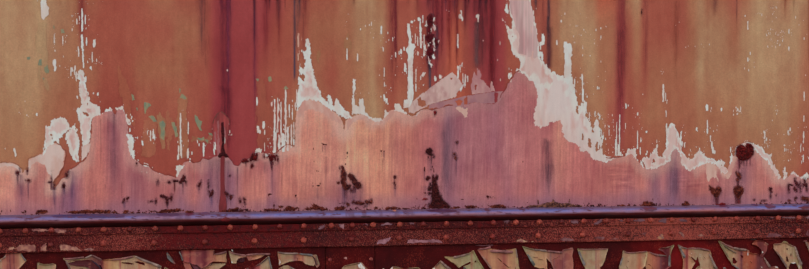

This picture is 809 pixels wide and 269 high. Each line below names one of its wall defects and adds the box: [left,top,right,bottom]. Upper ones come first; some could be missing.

corrosion [424,0,466,68]
peeling [0,0,809,215]
corrosion [152,175,194,213]
corrosion [241,153,279,168]
corrosion [262,152,398,212]
corrosion [416,148,477,209]
corrosion [733,143,754,204]
peeling [0,244,47,269]
peeling [37,244,320,269]
peeling [342,257,367,269]
peeling [432,236,618,269]
peeling [619,230,809,269]